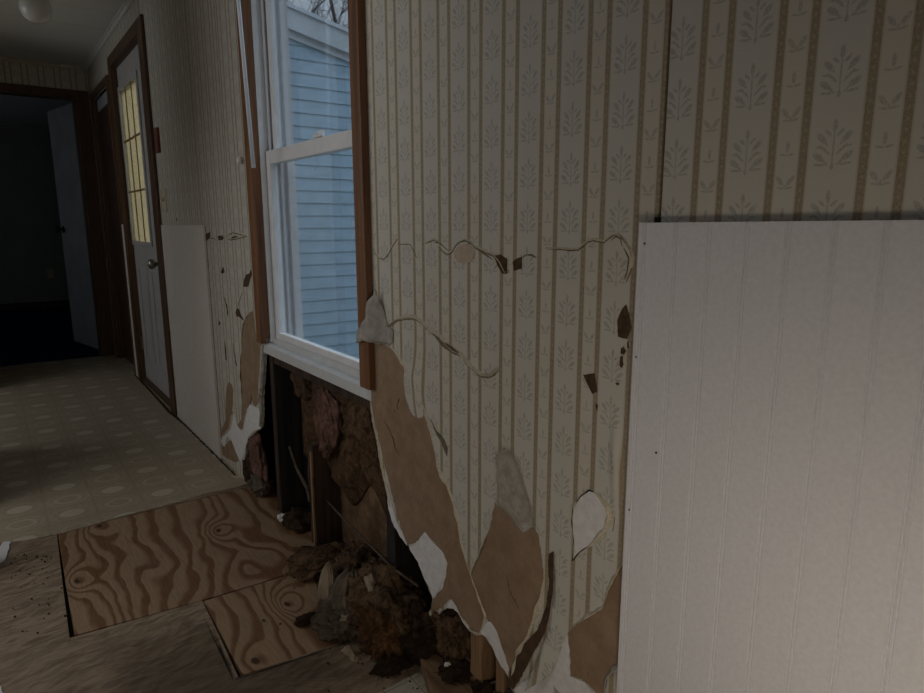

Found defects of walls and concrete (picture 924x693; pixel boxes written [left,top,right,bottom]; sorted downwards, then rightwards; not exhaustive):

peeling [356,289,394,346]
spalling [221,345,265,462]
spalling [368,395,447,599]
spalling [570,490,612,561]
spalling [481,622,509,674]
spalling [514,636,594,693]